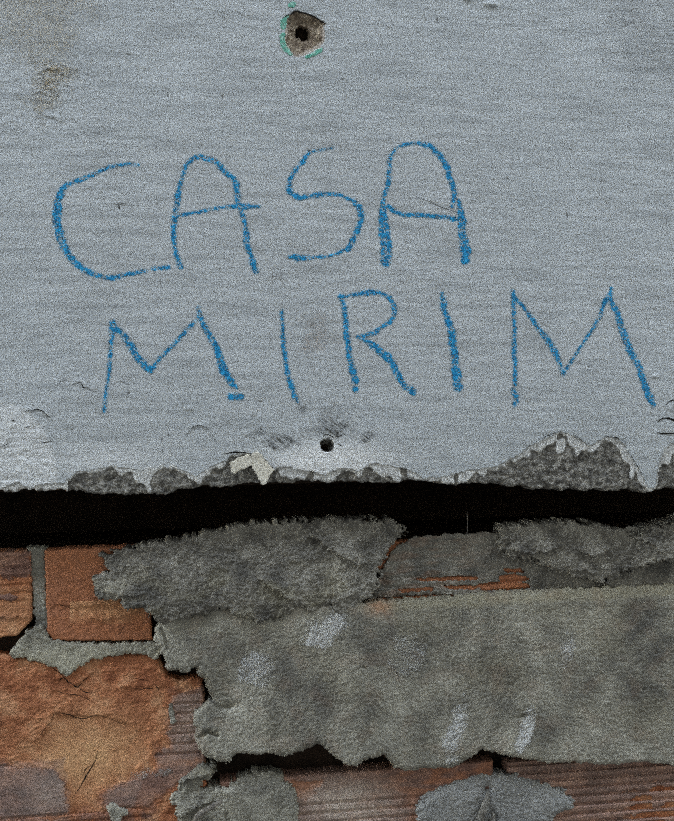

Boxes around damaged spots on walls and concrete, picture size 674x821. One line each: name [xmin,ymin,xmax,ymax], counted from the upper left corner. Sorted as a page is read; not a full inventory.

hole [279,2,326,59]
spalling [0,432,674,495]
spalling [0,576,35,637]
spalling [69,599,145,626]
crack [16,664,120,749]
spalling [0,650,204,821]
spalling [630,785,674,821]